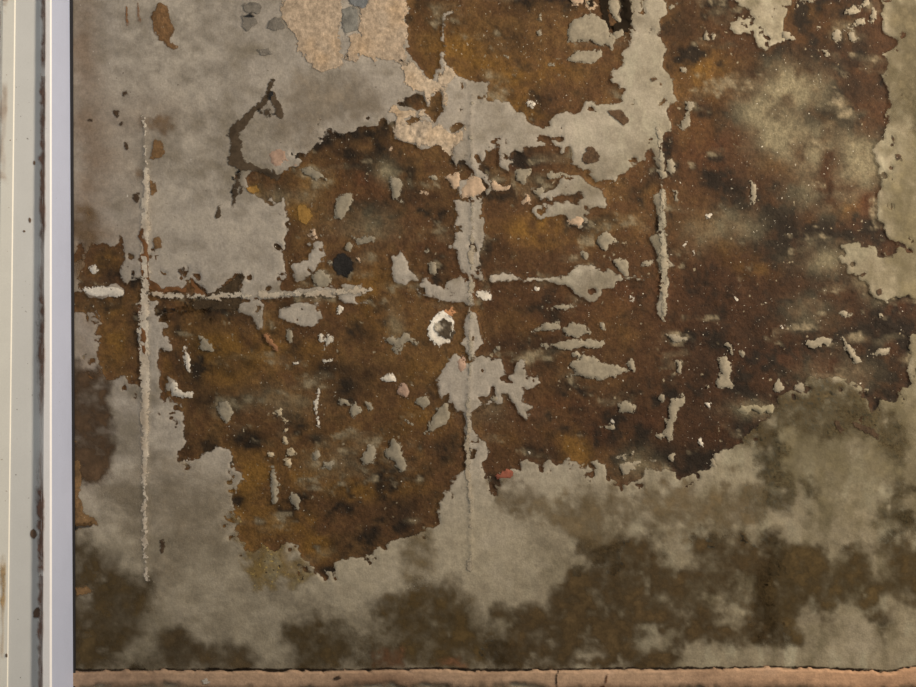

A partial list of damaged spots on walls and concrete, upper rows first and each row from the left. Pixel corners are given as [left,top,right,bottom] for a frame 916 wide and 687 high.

leakage [888,0,916,113]
peeling [74,0,916,581]
leakage [75,544,153,672]
leakage [159,628,253,669]
leakage [240,541,313,590]
crack [76,665,916,687]
leakage [283,376,916,671]